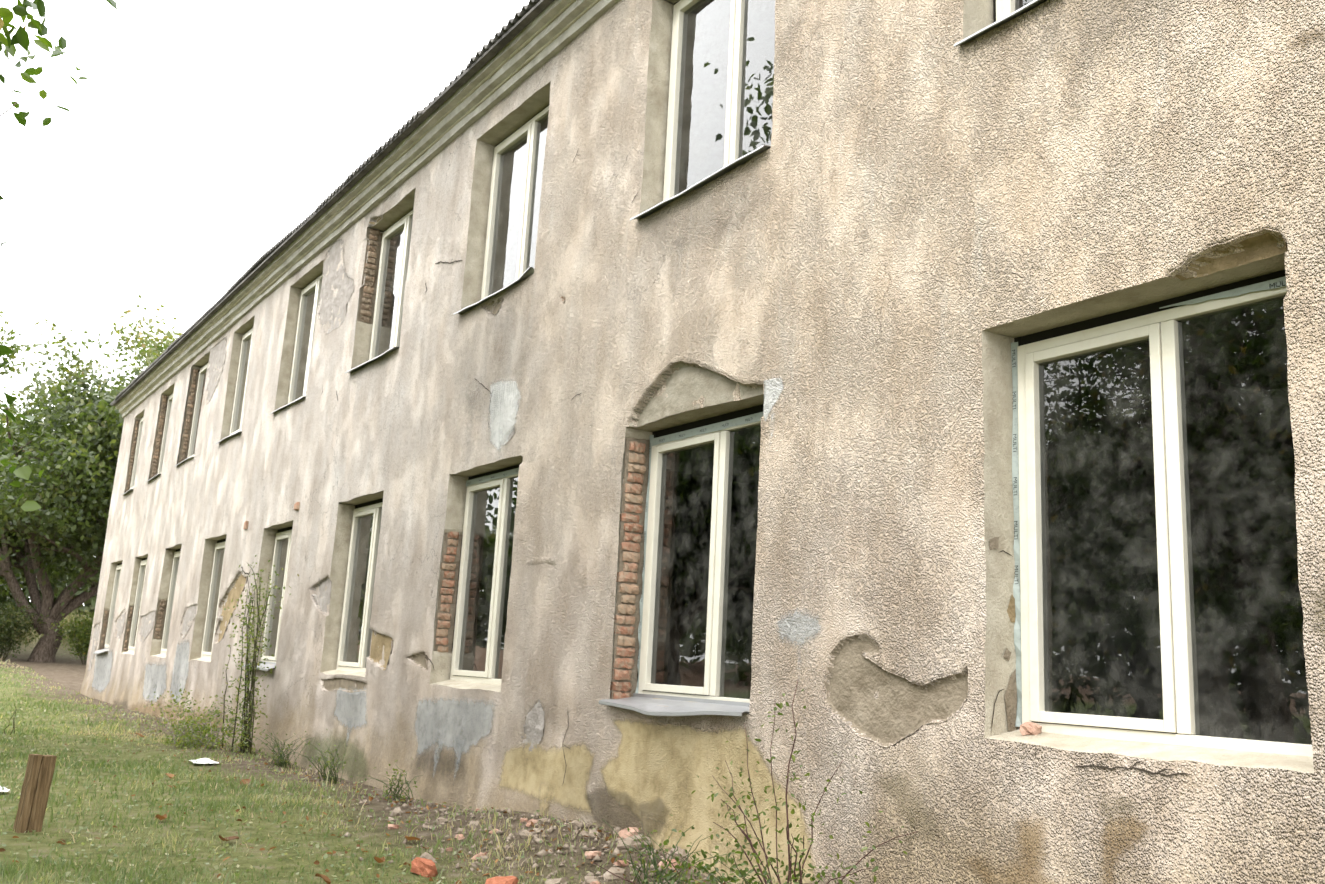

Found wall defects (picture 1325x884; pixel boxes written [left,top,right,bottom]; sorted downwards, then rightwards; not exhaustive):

flaking render [1169,228,1288,281]
peeling [490,382,520,449]
flaking render [610,360,764,699]
flaking render [310,576,331,615]
flaking render [366,531,462,672]
flaking render [320,677,367,693]
flaking render [822,634,970,748]